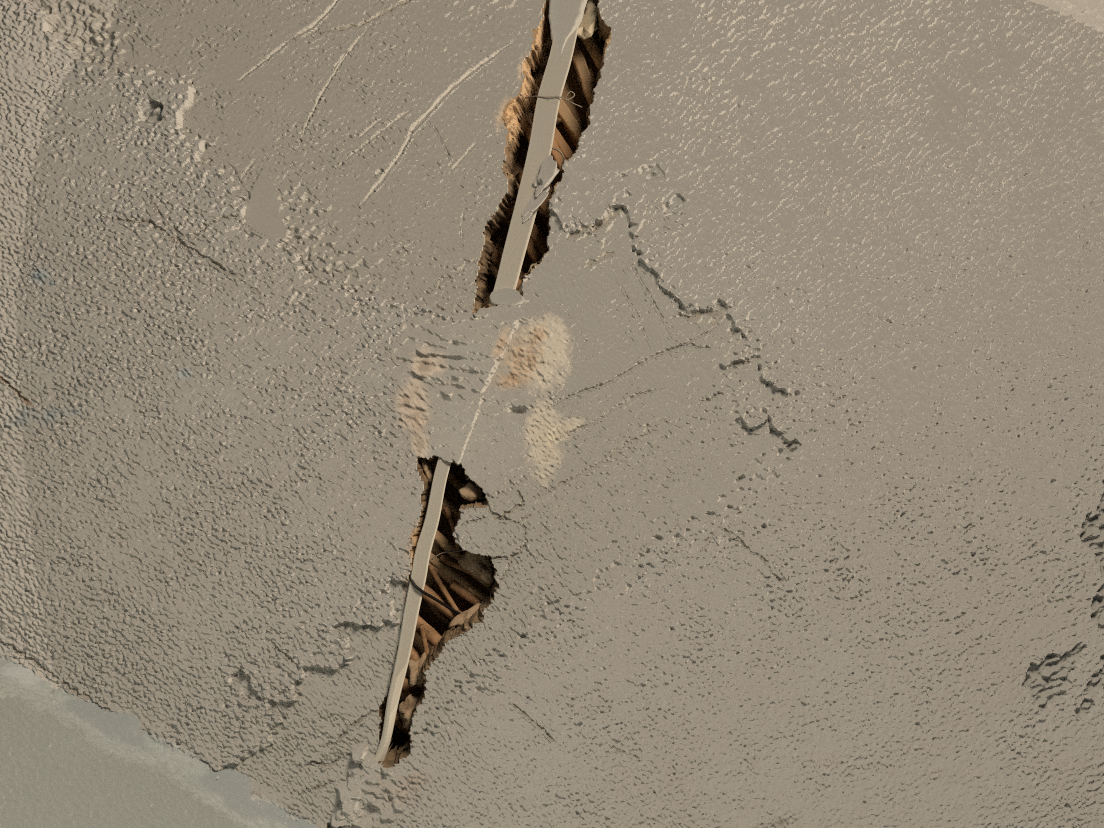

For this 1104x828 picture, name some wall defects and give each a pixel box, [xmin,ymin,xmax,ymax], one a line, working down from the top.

spalling [29,0,546,315]
crack [101,203,260,294]
crack [730,358,750,366]
spalling [408,205,801,739]
crack [296,419,683,794]
spalling [1022,644,1086,711]
spalling [1075,655,1104,719]
spalling [1080,480,1104,630]